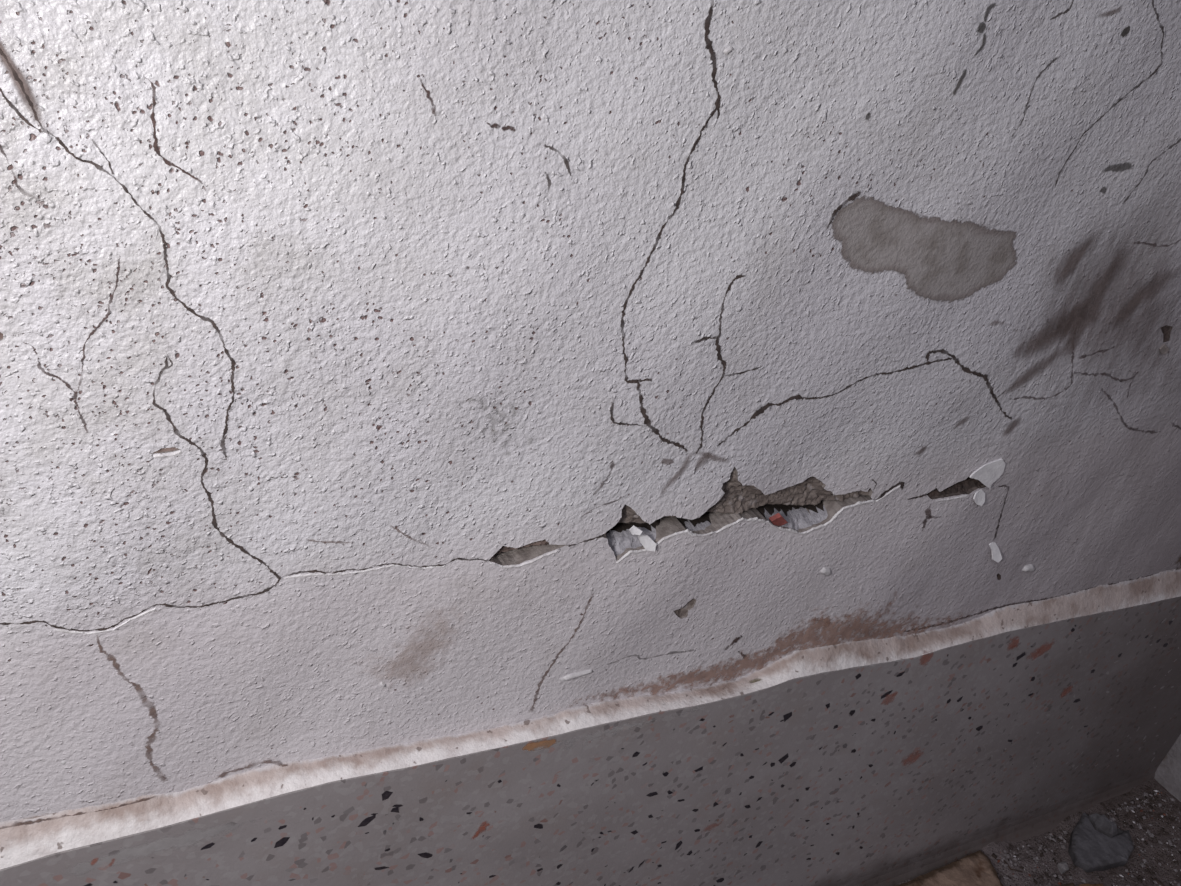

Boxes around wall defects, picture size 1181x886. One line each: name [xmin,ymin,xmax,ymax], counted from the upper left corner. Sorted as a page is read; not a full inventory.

crack [487,122,516,131]
crack [545,145,571,188]
crack [610,0,1181,454]
damp [1059,242,1089,279]
damp [1026,264,1117,351]
damp [1011,355,1055,389]
crack [0,42,487,826]
flaking render [596,467,875,563]
crack [872,479,932,528]
flaking render [927,458,1006,506]
flaking render [489,539,566,569]
corrosion [601,602,957,702]